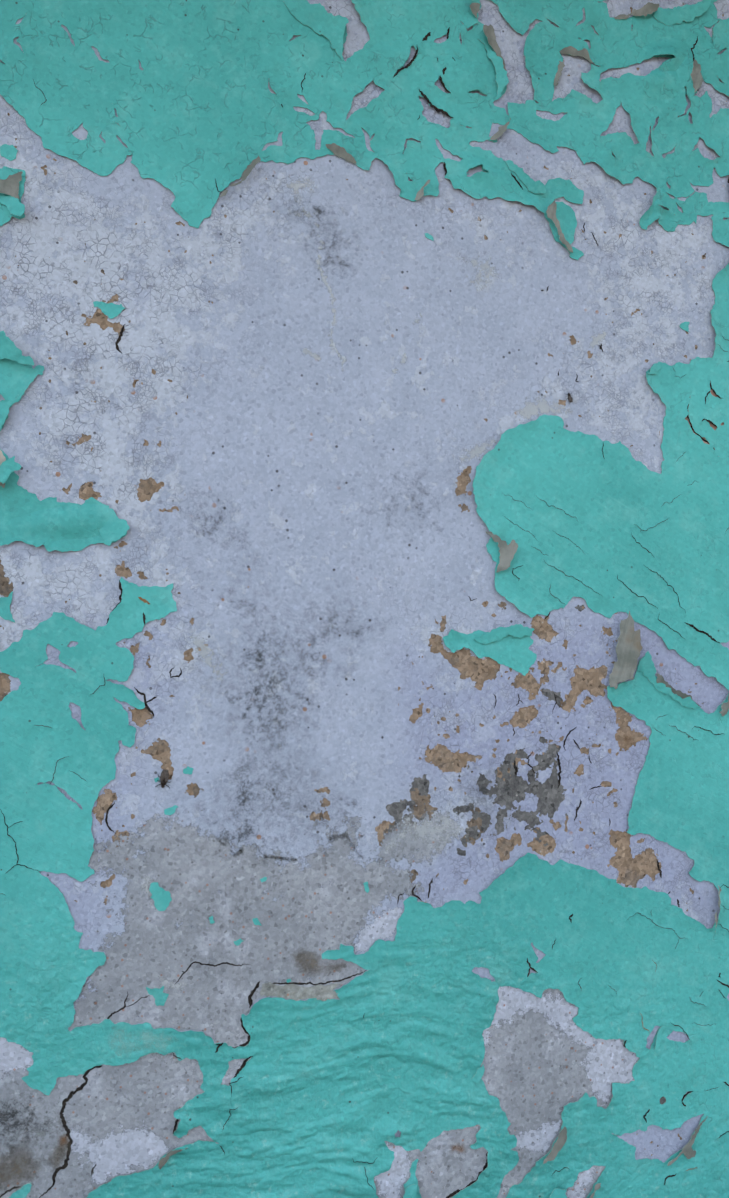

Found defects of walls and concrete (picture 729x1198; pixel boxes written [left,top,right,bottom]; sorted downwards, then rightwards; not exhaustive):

peeling [283,0,370,62]
peeling [466,0,542,115]
peeling [552,8,671,103]
peeling [598,0,729,37]
crack [504,336,729,643]
peeling [0,94,729,1047]
crack [0,809,32,895]
water stain [0,1152,36,1188]
peeling [0,1052,218,1198]
peeling [374,1125,488,1198]
peeling [471,967,690,1198]
peeling [612,1114,708,1166]